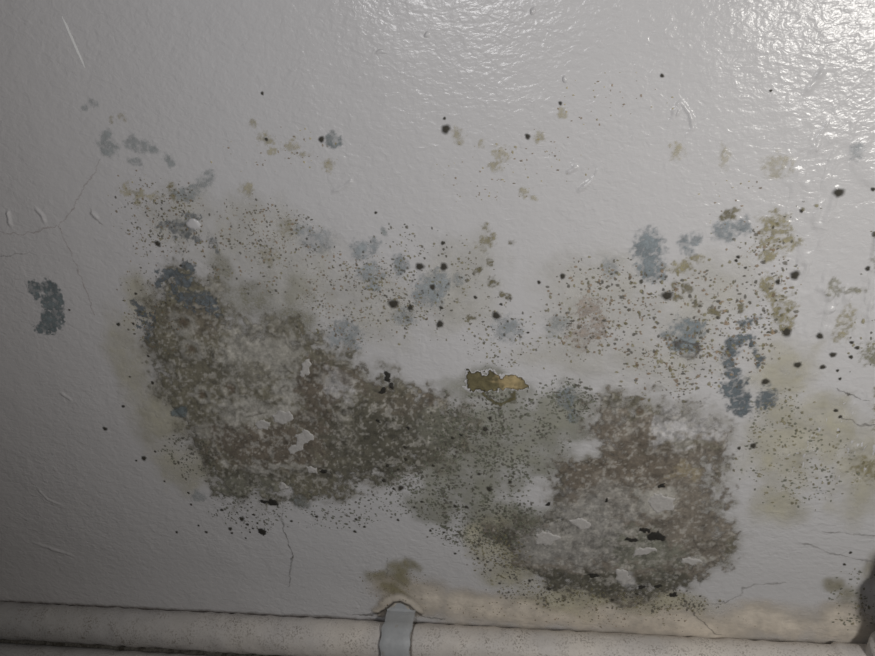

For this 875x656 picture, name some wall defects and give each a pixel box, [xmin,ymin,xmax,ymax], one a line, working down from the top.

damp [256,128,342,168]
damp [490,129,560,200]
damp [113,160,875,643]
peeling [462,368,530,406]